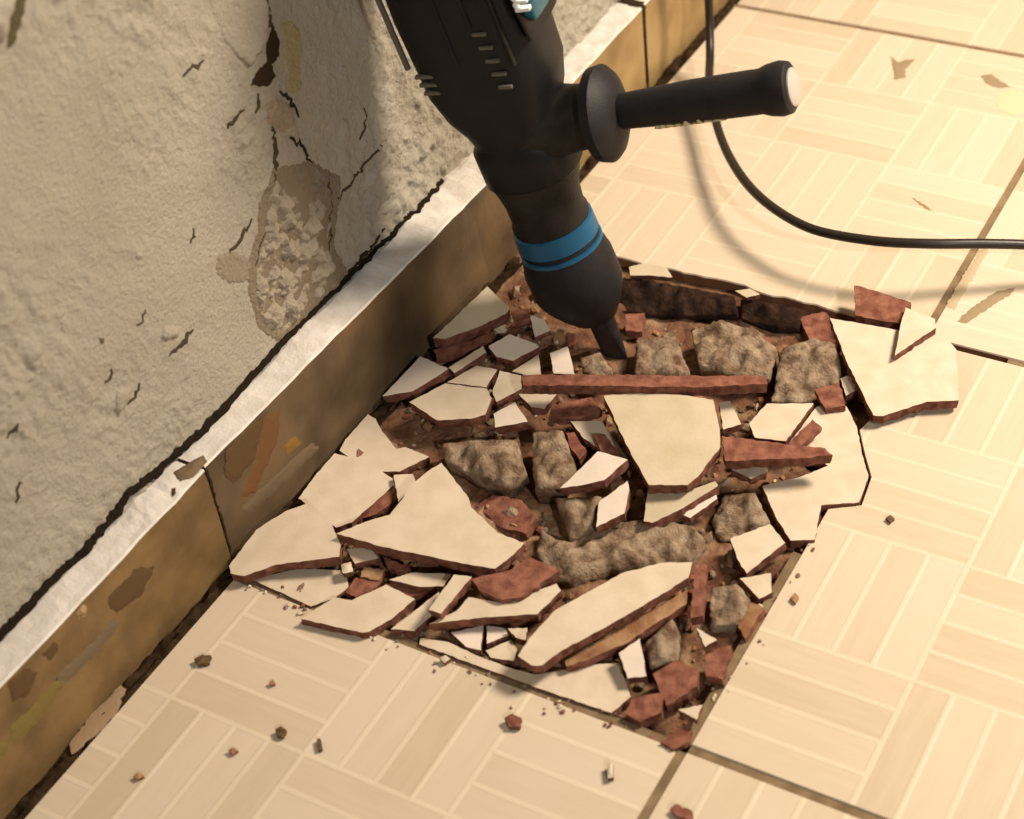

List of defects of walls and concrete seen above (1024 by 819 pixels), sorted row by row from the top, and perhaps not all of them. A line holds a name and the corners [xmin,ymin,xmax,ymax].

crack [265,0,273,27]
crack [182,60,204,78]